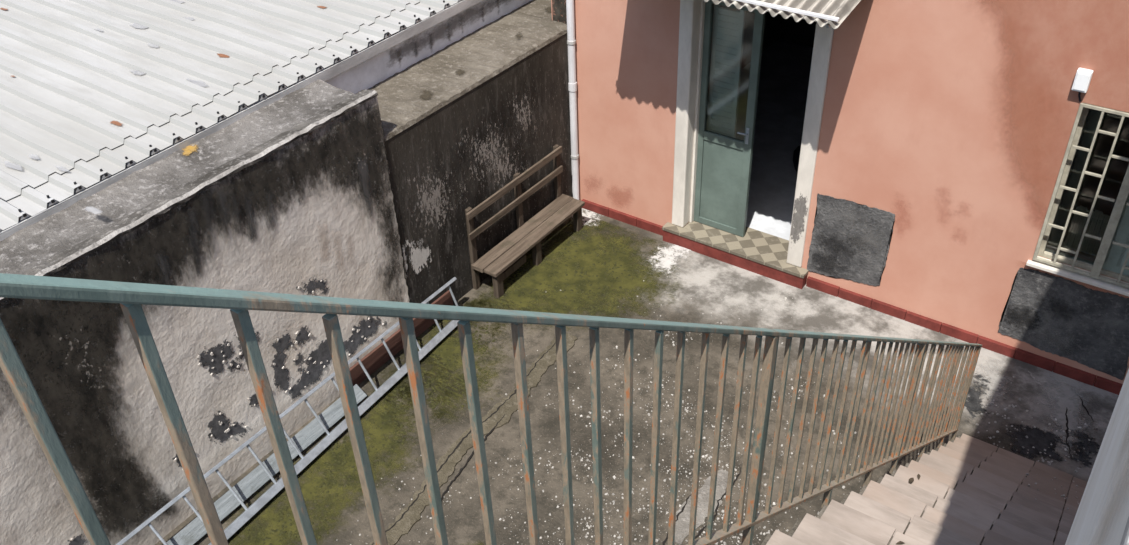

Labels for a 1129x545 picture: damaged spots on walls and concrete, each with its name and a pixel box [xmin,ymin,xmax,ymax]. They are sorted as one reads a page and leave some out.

leakage [48,103,402,301]
peeling [296,277,329,295]
peeling [197,334,244,375]
peeling [255,325,331,400]
peeling [343,316,387,357]
leakage [0,298,175,539]
peeling [208,410,247,445]
crack [372,342,556,545]
crack [1065,396,1094,459]
peeling [66,534,87,545]